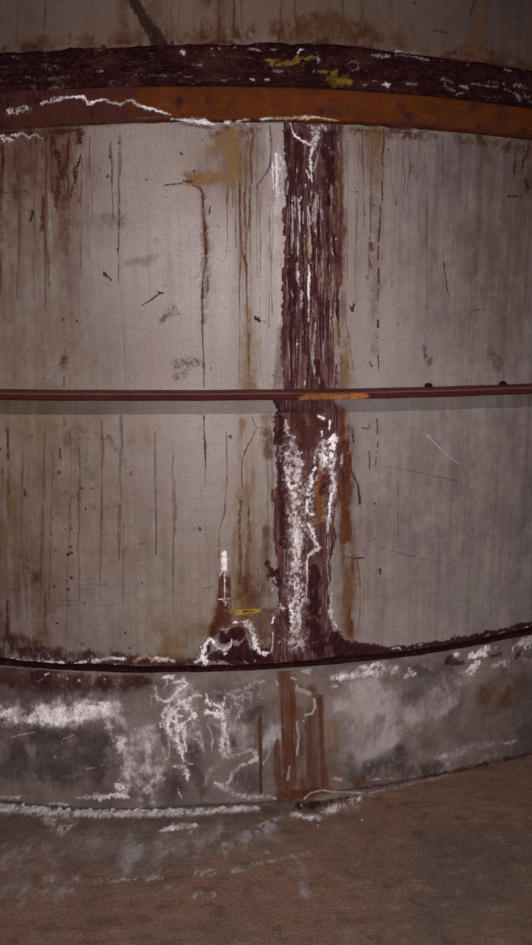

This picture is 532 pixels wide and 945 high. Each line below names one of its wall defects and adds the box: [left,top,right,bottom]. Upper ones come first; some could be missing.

water stain [0,415,530,836]
rust [0,87,532,804]